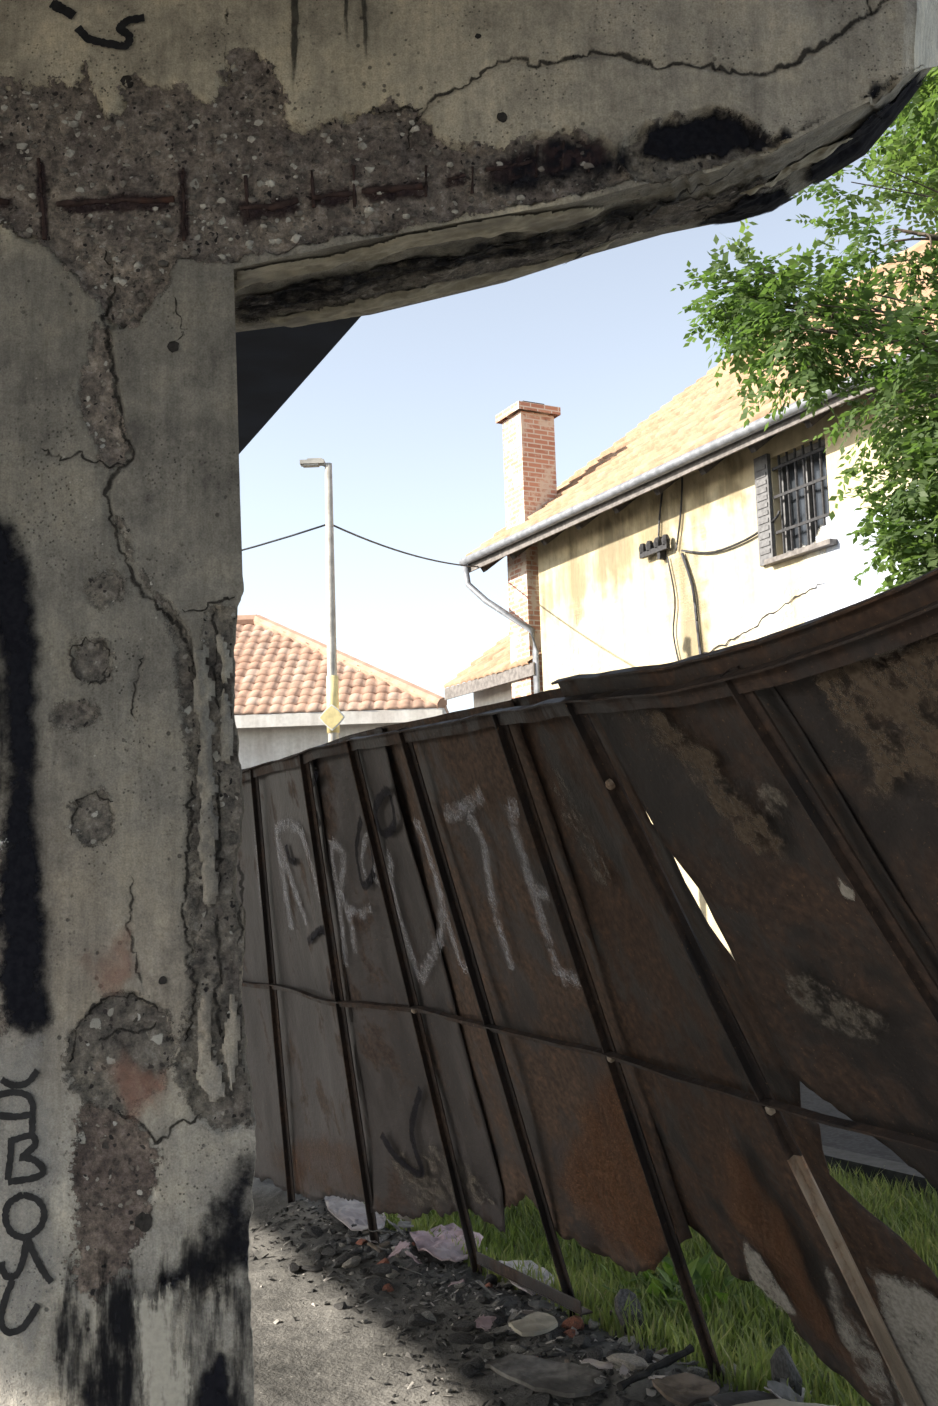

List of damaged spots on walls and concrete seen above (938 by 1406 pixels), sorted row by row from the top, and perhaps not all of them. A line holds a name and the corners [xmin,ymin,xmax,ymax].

crack [368,0,888,149]
spalling [0,47,853,468]
crack [42,250,235,709]
spalling [48,634,117,733]
crack [130,656,144,720]
spalling [60,514,253,1306]
peeling [134,1281,193,1406]